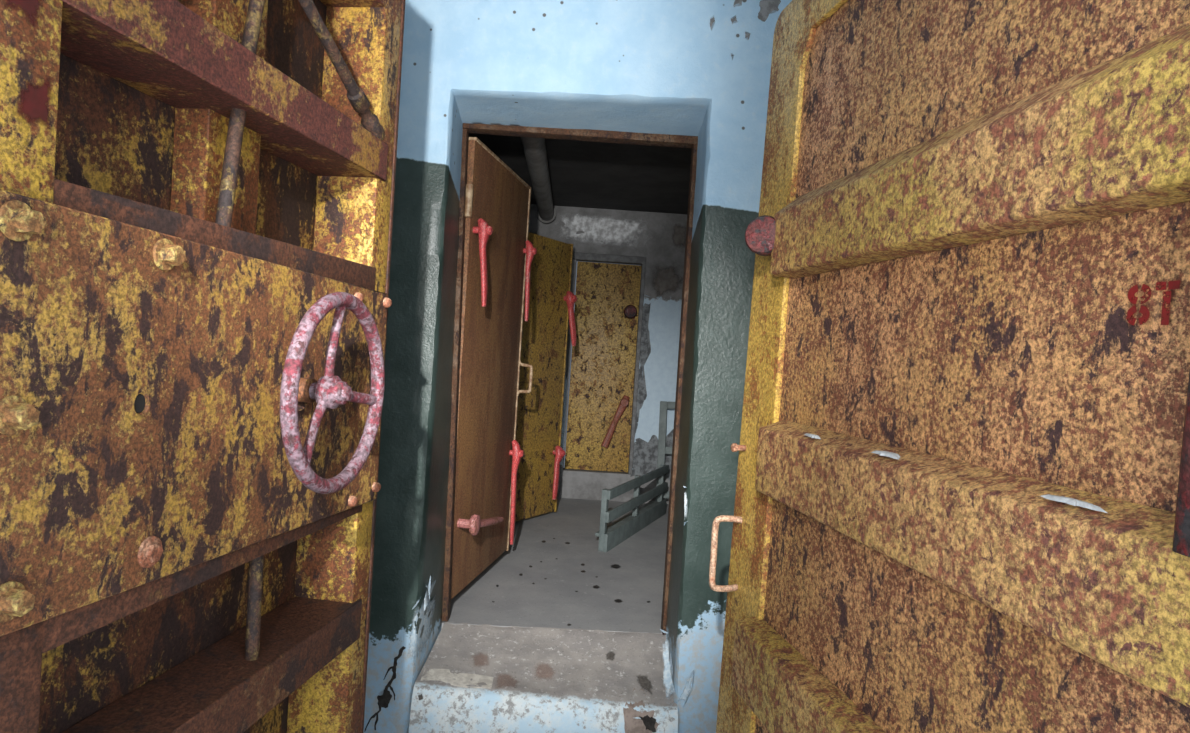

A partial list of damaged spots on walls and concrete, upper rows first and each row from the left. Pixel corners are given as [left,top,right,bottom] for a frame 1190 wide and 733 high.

peeling [731,0,751,40]
peeling [758,0,781,22]
crack [364,646,406,732]
spalling [623,629,695,733]